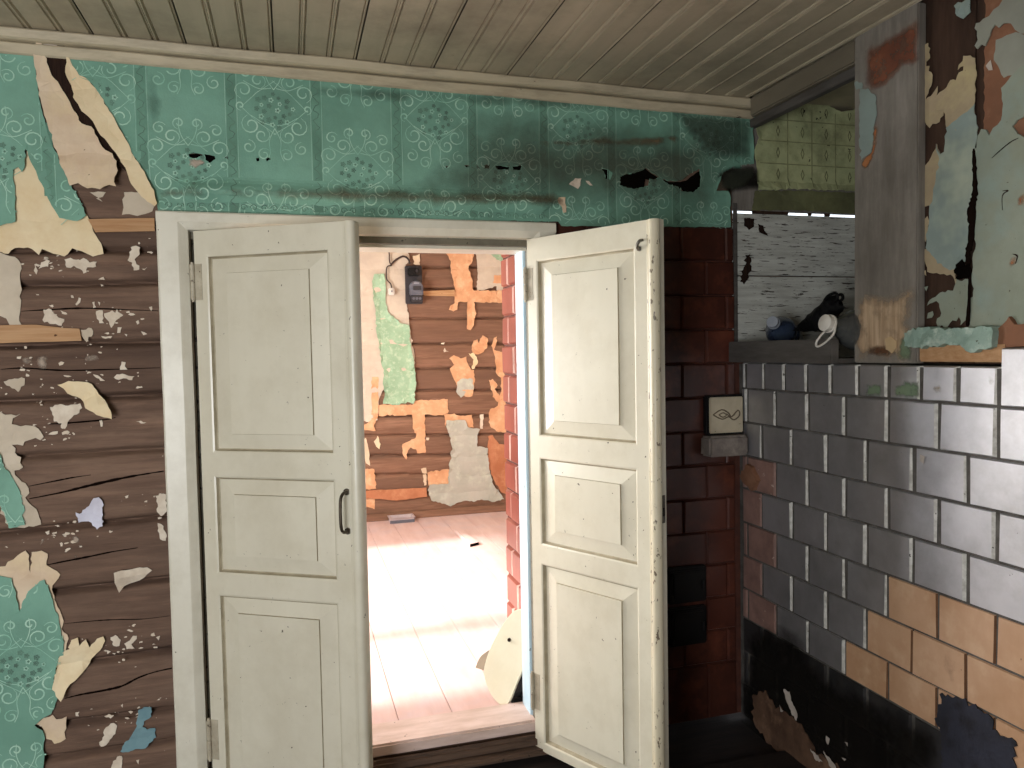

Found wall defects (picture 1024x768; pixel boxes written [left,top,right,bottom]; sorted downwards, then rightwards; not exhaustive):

leakage [684,116,746,153]
peeling [854,81,877,160]
leakage [478,138,694,187]
peeling [924,0,1024,328]
peeling [744,218,768,236]
peeling [740,254,752,284]
peeling [71,295,104,323]
peeling [857,292,910,358]
peeling [988,316,1024,348]
peeling [158,523,167,541]
spalling [751,689,848,768]